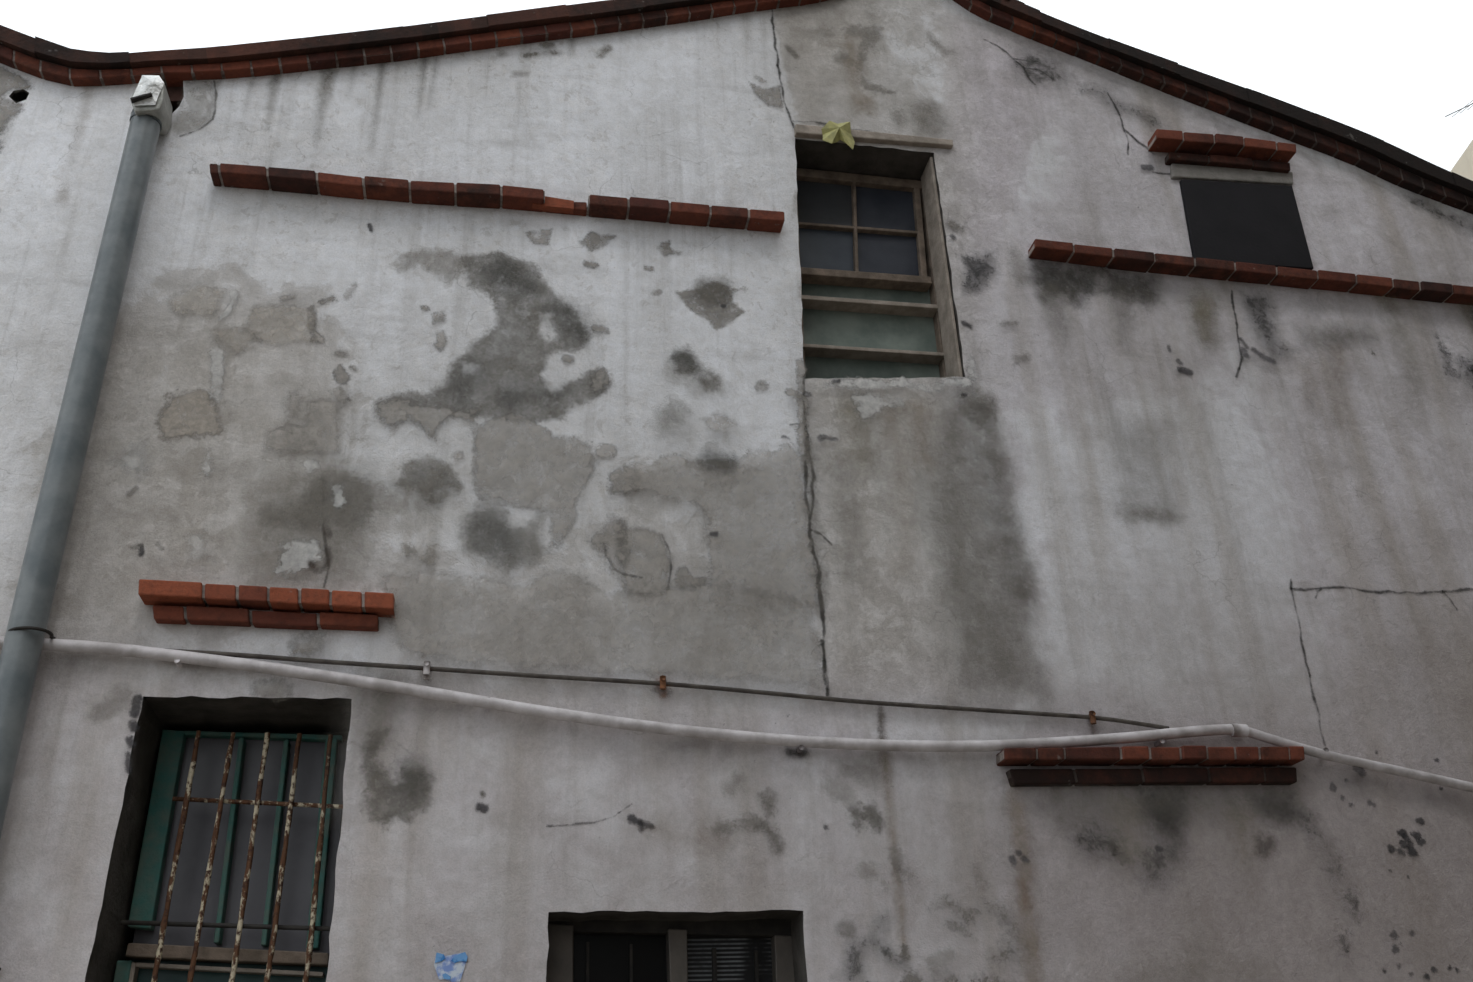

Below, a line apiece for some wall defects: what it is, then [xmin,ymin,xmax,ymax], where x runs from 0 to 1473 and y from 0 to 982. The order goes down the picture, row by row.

crack [997,45,1054,84]
crack [1107,92,1169,174]
crack [1231,292,1243,377]
crack [791,376,832,696]
crack [1290,580,1473,743]
spalling [1388,817,1426,878]